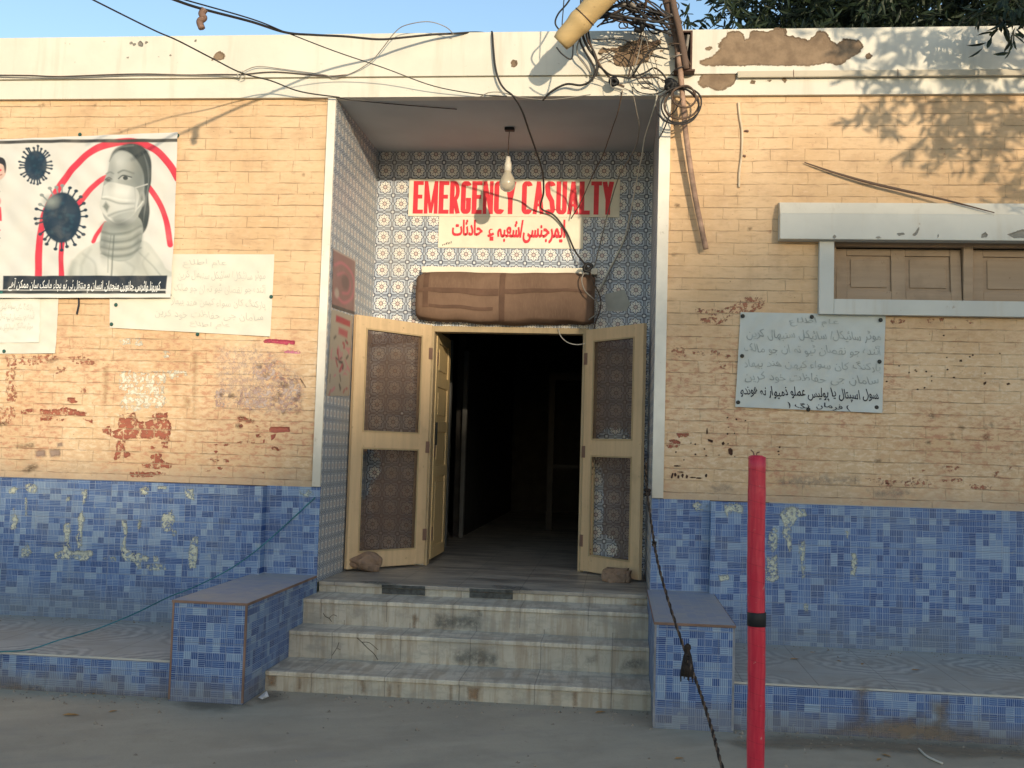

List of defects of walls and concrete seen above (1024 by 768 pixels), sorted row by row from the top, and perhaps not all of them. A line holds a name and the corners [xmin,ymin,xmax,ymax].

spalling [698,27,873,91]
peeling [695,297,764,325]
peeling [0,351,186,494]
peeling [76,490,87,548]
peeling [188,537,198,568]
peeling [766,527,779,582]